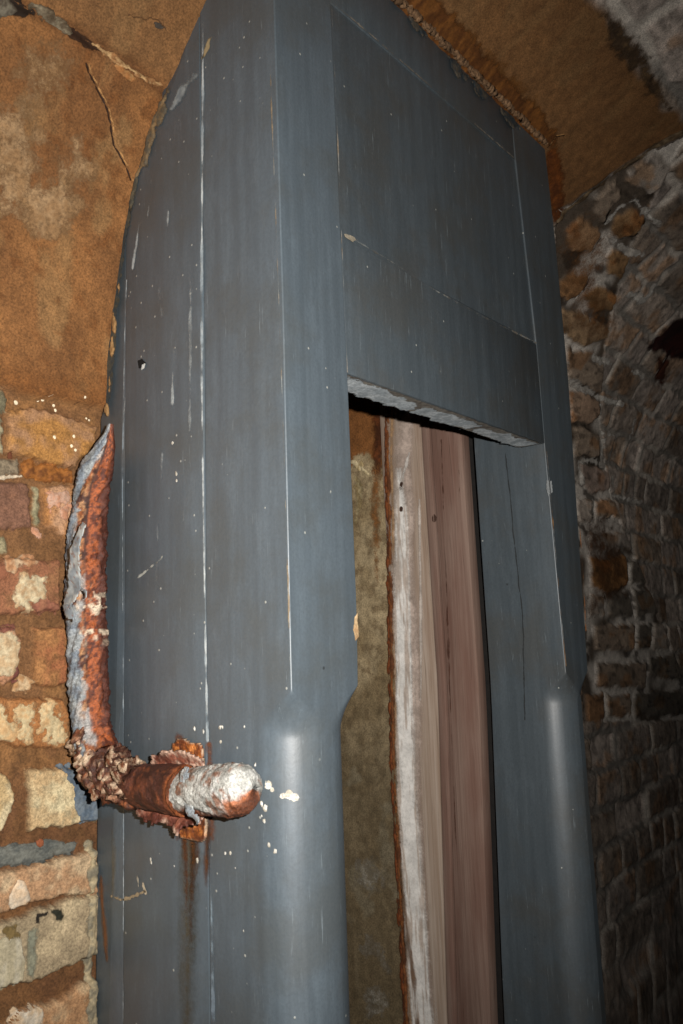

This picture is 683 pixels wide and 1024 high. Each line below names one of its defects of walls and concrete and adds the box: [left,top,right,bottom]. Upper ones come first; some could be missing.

crack [86,63,134,181]
rust [371,401,412,1024]
crack [505,454,525,720]
rust [178,817,213,893]